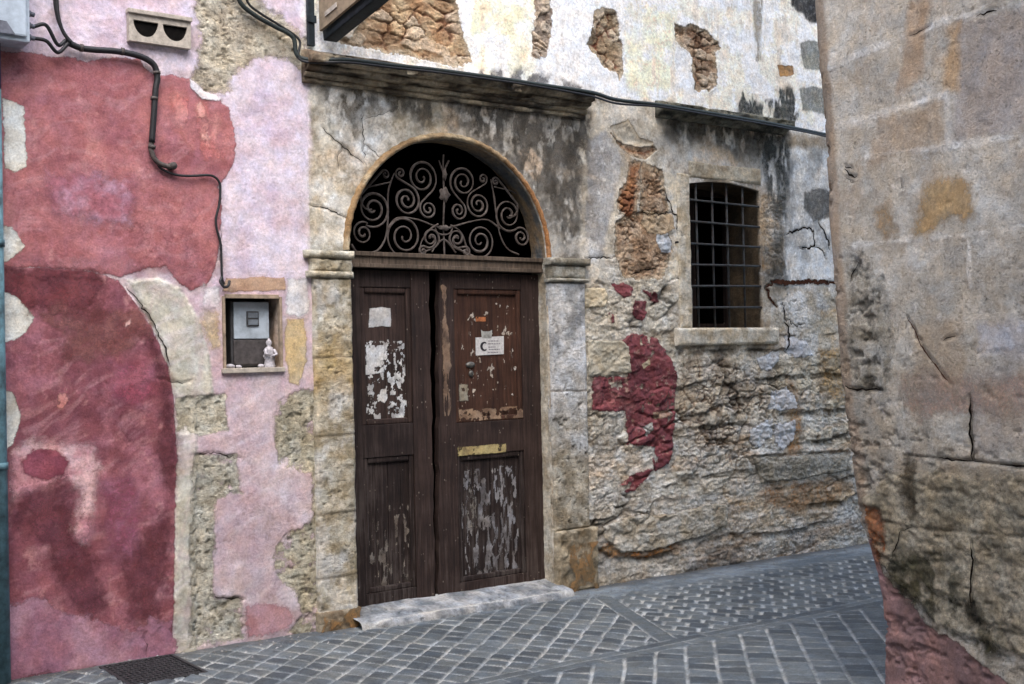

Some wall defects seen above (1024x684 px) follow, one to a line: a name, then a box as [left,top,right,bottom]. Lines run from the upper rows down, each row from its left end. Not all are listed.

spalling [338,0,472,68]
spalling [587,7,624,81]
spalling [674,24,721,92]
damp [738,87,799,121]
crack [323,109,395,169]
damp [666,119,791,286]
flaking render [1,0,318,680]
flaking render [591,133,677,493]
crack [765,223,859,350]
crack [906,318,955,382]
crack [939,398,1024,467]
crack [967,542,975,604]